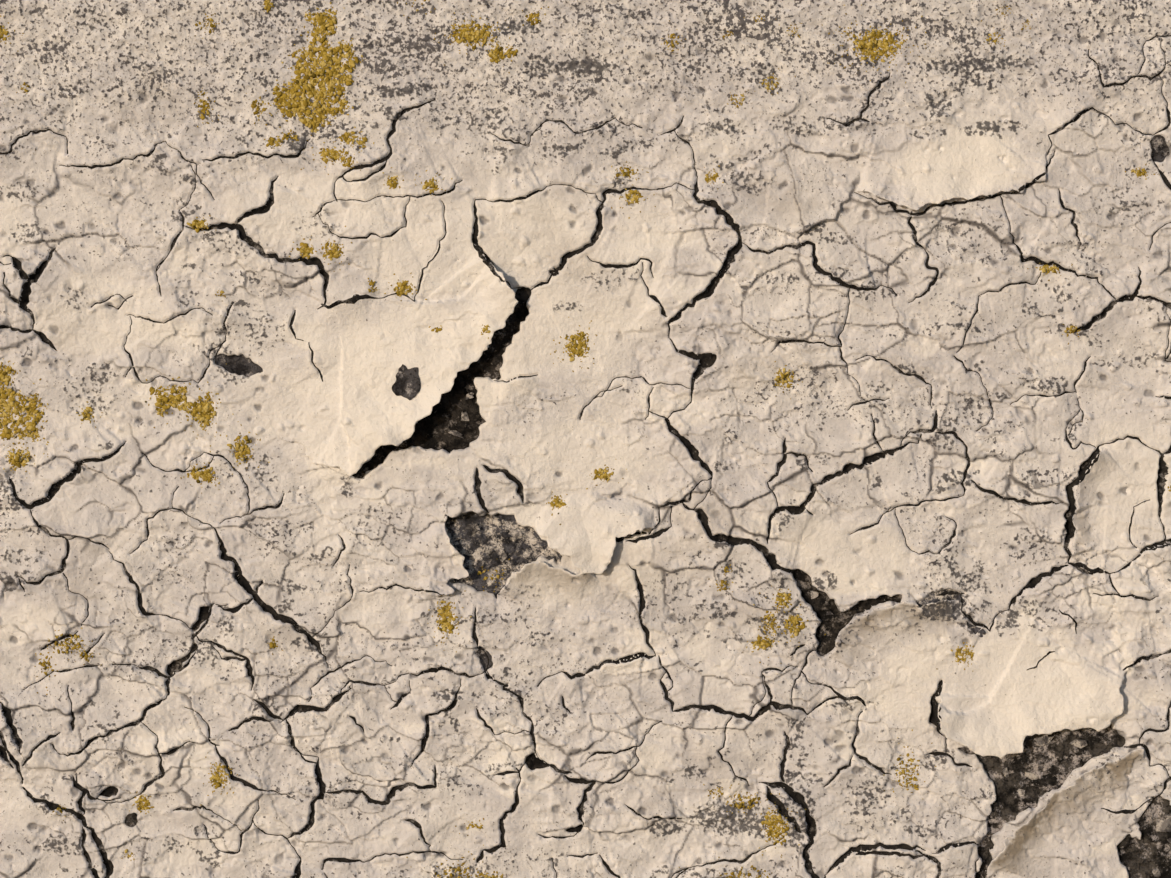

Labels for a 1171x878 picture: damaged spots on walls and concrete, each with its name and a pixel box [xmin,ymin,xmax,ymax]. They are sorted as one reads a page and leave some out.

peeling [214,238,531,478]
crack [0,35,1171,632]
crack [0,441,981,878]
spalling [406,494,660,645]
spalling [792,569,1171,878]
crack [1027,610,1077,670]
crack [1101,702,1171,814]
crack [1123,649,1171,671]